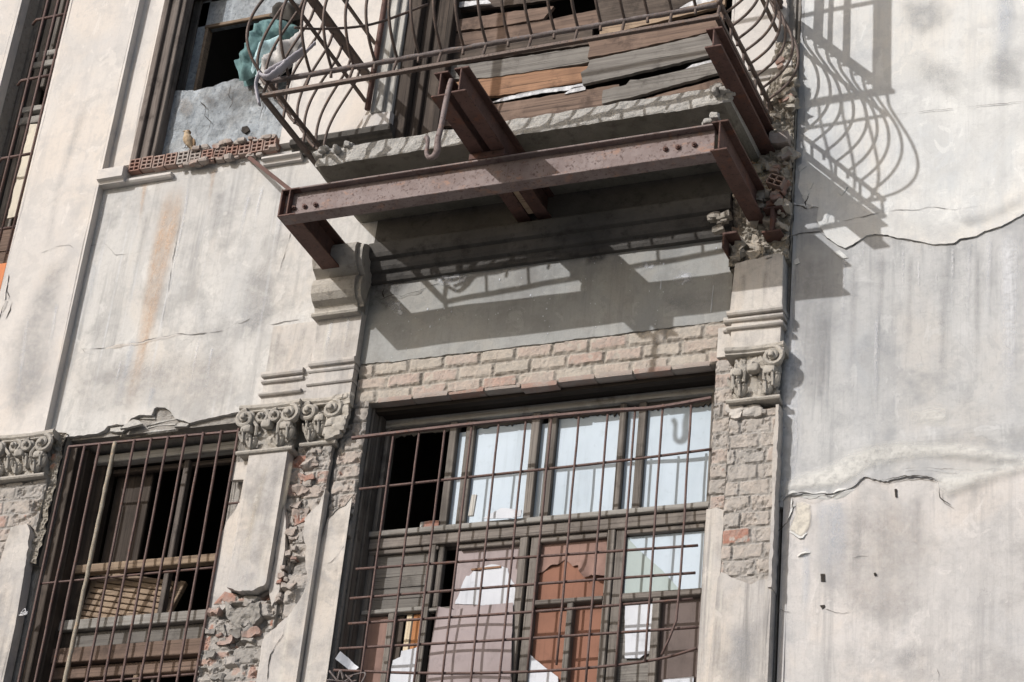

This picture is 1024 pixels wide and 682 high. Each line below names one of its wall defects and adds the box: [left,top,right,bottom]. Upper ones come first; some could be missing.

crack [73,216,311,351]
spalling [178,126,280,168]
spalling [707,40,814,274]
crack [794,196,1018,249]
spalling [0,432,71,568]
spalling [196,392,372,682]
peeling [789,502,810,558]
crack [778,468,968,531]